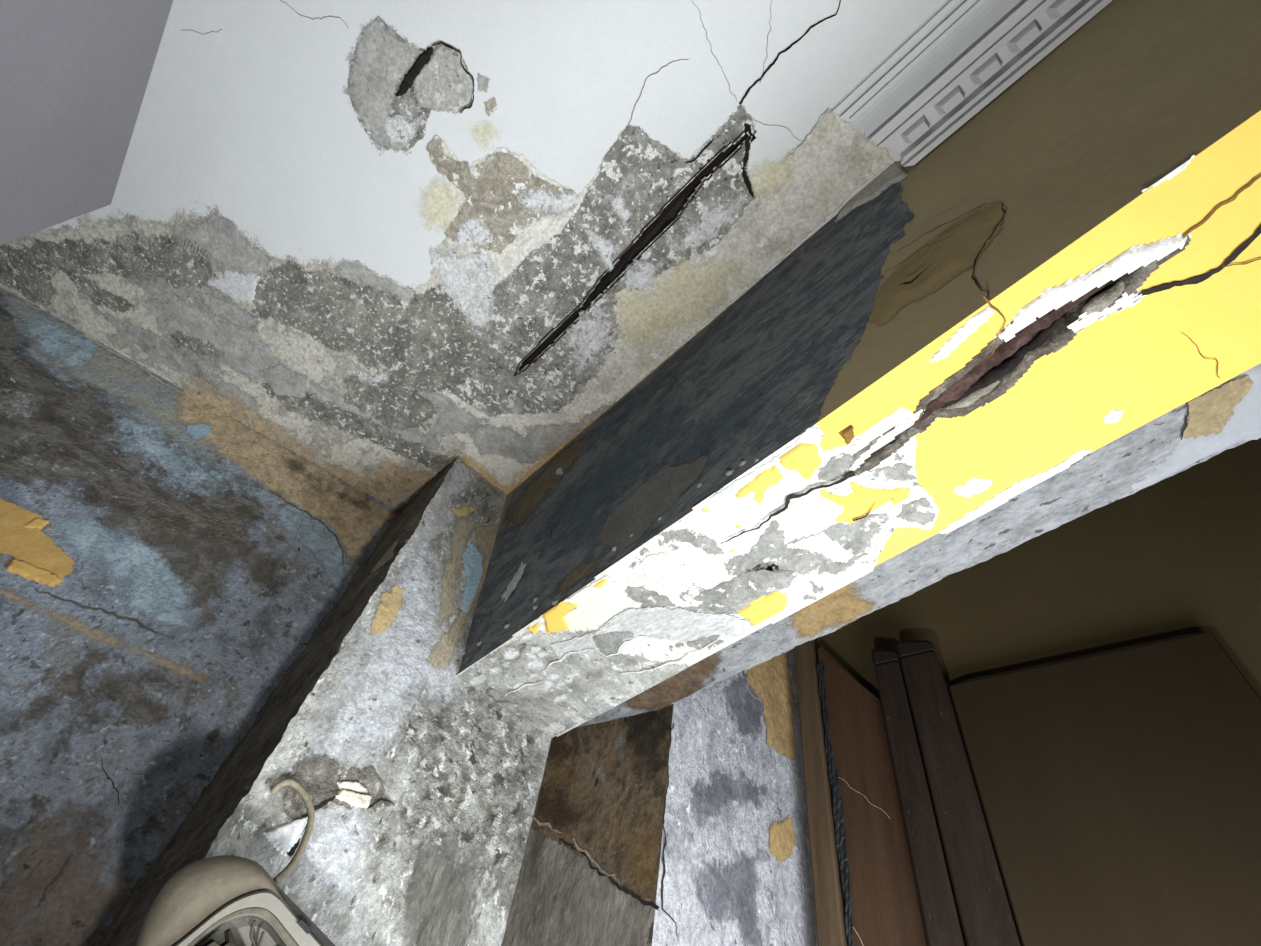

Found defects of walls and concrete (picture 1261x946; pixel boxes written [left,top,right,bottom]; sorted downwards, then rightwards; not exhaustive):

crack [628,0,841,179]
peeling [0,16,1195,739]
crack [970,204,1006,371]
crack [1133,225,1261,303]
crack [1182,333,1219,378]
crack [1182,175,1261,239]
damp [0,293,591,767]
peeling [746,651,796,760]
damp [0,805,132,946]
damp [302,807,370,898]